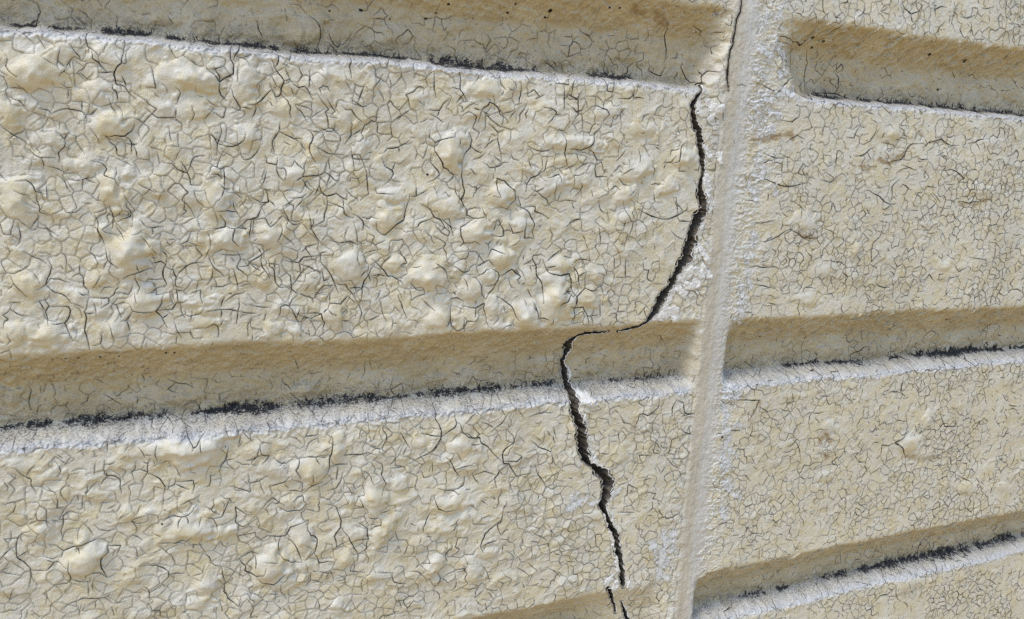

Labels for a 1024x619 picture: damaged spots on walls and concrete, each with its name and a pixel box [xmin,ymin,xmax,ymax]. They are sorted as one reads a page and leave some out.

crack [0,0,745,619]
crack [737,0,1024,318]